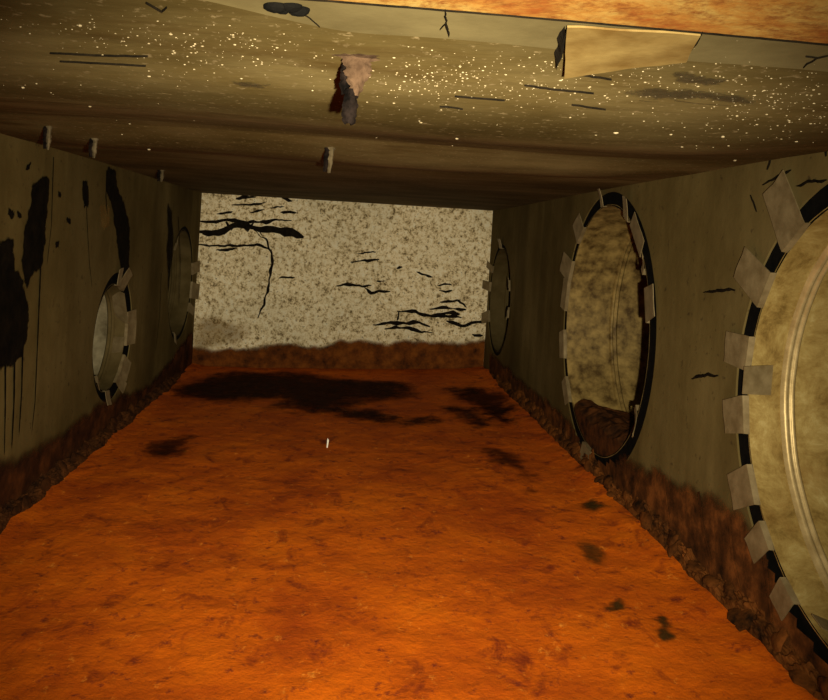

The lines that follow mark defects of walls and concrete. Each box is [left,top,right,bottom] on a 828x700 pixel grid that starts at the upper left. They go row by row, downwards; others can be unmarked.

peeling [331,53,379,126]
water stain [0,157,61,453]
water stain [105,167,130,276]
crack [199,195,304,318]
crack [336,251,483,337]